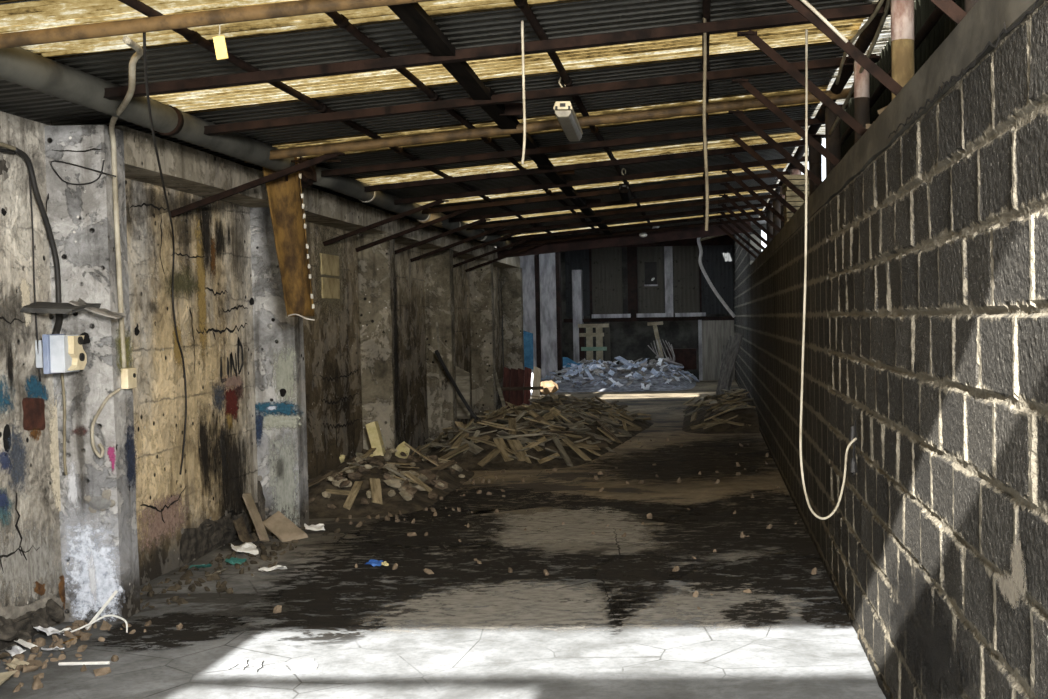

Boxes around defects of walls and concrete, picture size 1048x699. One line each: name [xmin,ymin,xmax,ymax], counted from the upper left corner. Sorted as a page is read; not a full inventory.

damp [0,279,31,392]
damp [68,431,84,504]
damp [198,411,249,520]
damp [269,433,300,525]
damp [588,435,778,485]
crack [0,493,40,573]
damp [0,486,853,651]